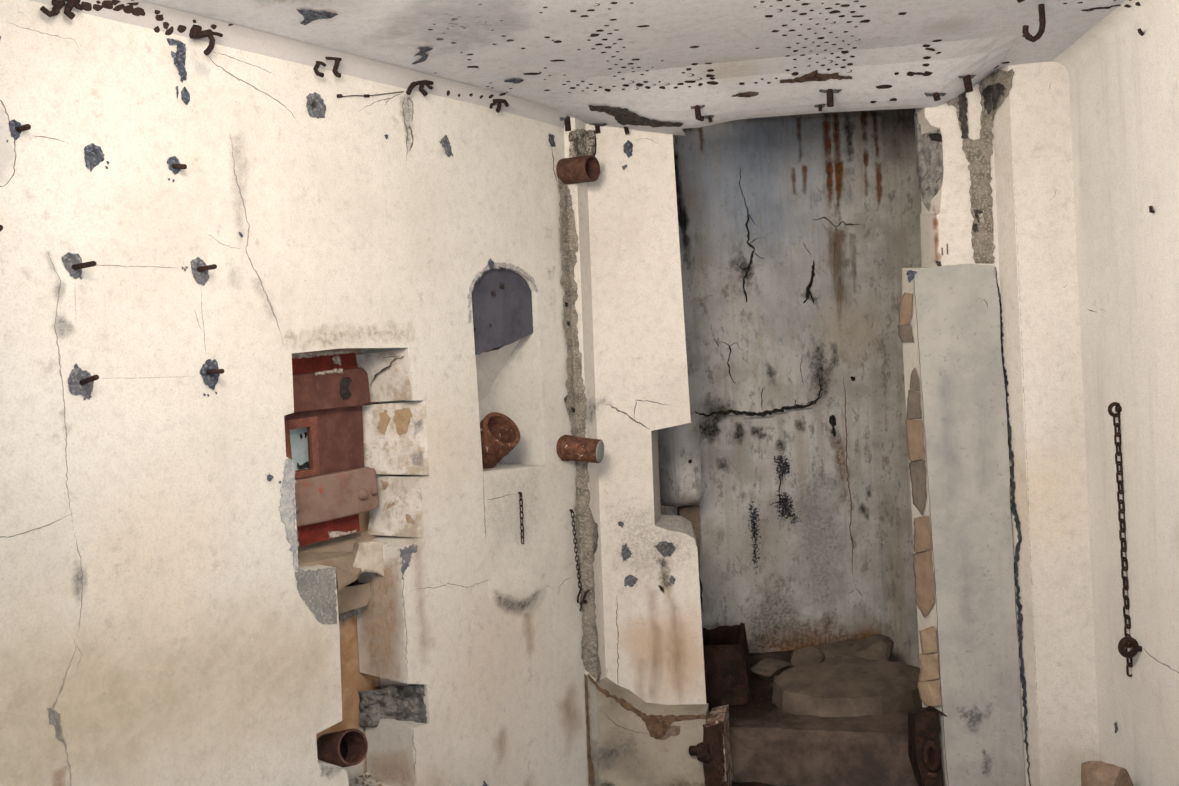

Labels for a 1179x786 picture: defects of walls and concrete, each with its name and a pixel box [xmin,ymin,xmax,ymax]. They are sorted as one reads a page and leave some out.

spalling [558,179,587,438]
spalling [589,105,684,127]
spalling [574,461,707,740]
damp [699,402,727,441]
crack [605,338,863,597]
crack [737,166,764,302]
damp [748,504,765,574]
damp [773,442,801,524]
damp [812,347,835,396]
crack [803,216,861,304]
spalling [946,69,1014,264]
crack [984,207,1041,786]